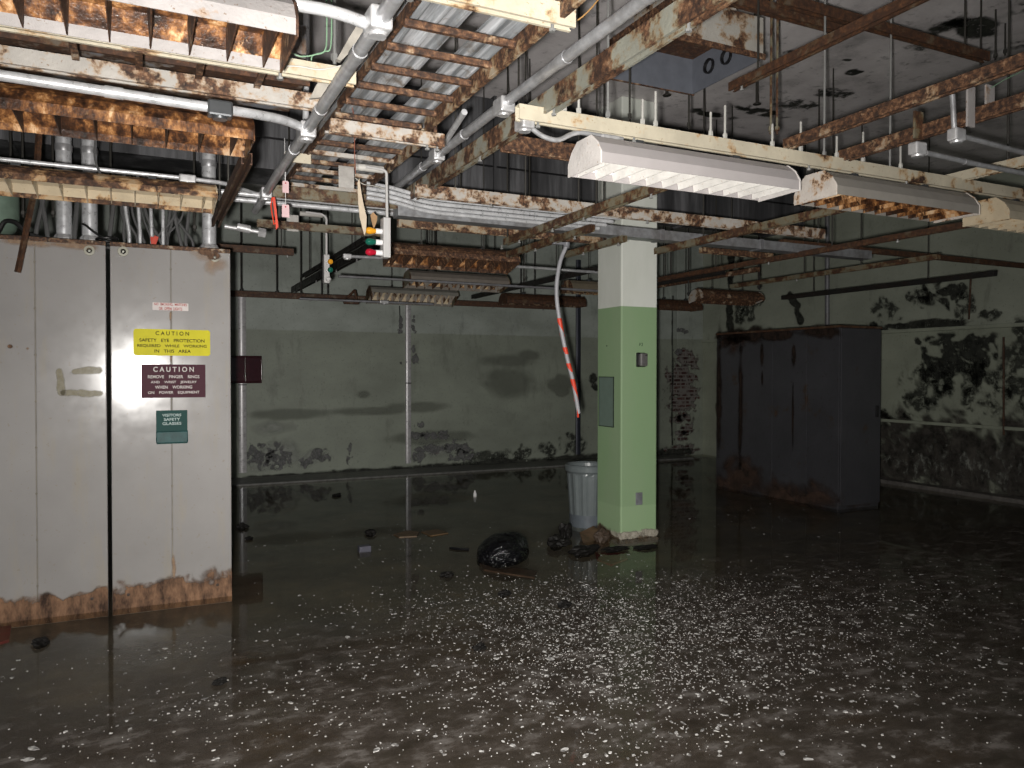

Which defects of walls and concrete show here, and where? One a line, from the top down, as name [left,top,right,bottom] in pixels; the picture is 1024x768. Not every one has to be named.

spalling [659,348,700,456]
mould [248,432,598,477]
corrosion [0,557,232,628]